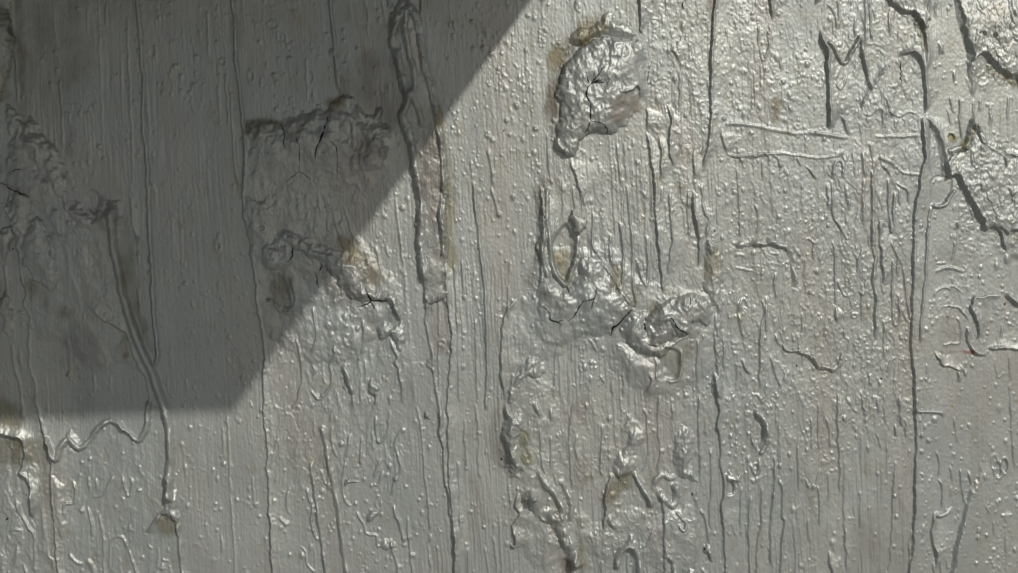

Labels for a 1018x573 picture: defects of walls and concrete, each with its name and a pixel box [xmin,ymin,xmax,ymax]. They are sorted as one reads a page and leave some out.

peeling [818,29,857,130]
peeling [886,0,1018,573]
peeling [49,399,152,463]
peeling [50,475,67,541]